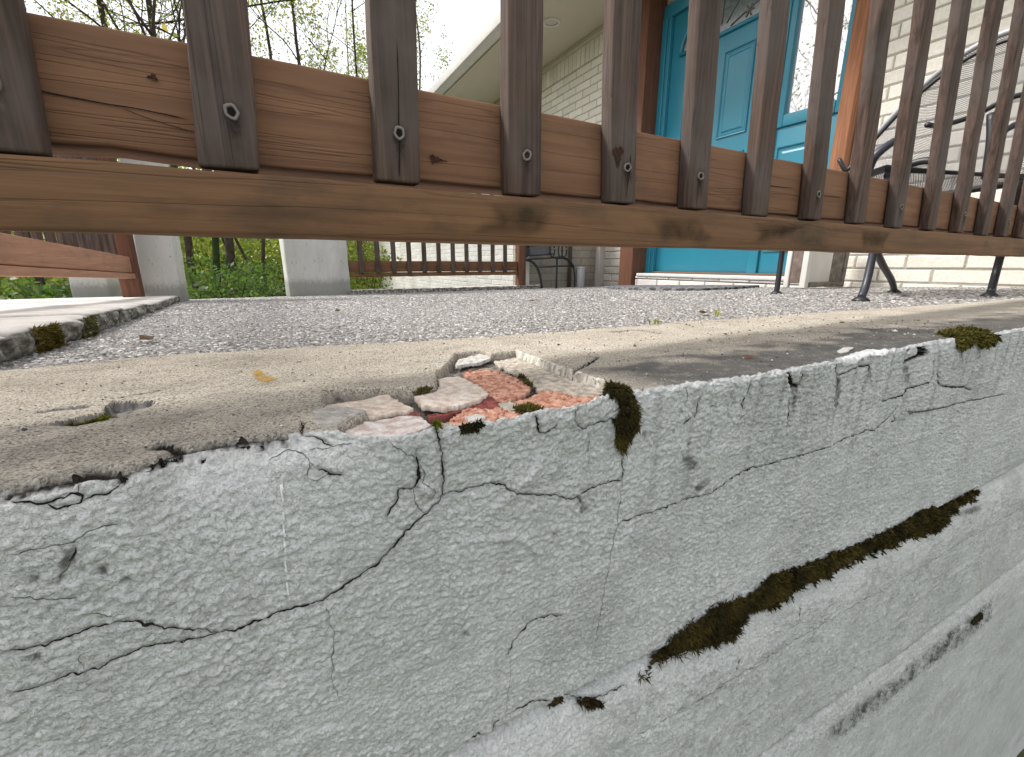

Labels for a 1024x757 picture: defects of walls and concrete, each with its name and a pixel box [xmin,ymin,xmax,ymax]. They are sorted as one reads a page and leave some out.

spalling [37,400,155,426]
spalling [312,349,609,441]
crack [11,348,1003,698]
crack [465,613,622,742]